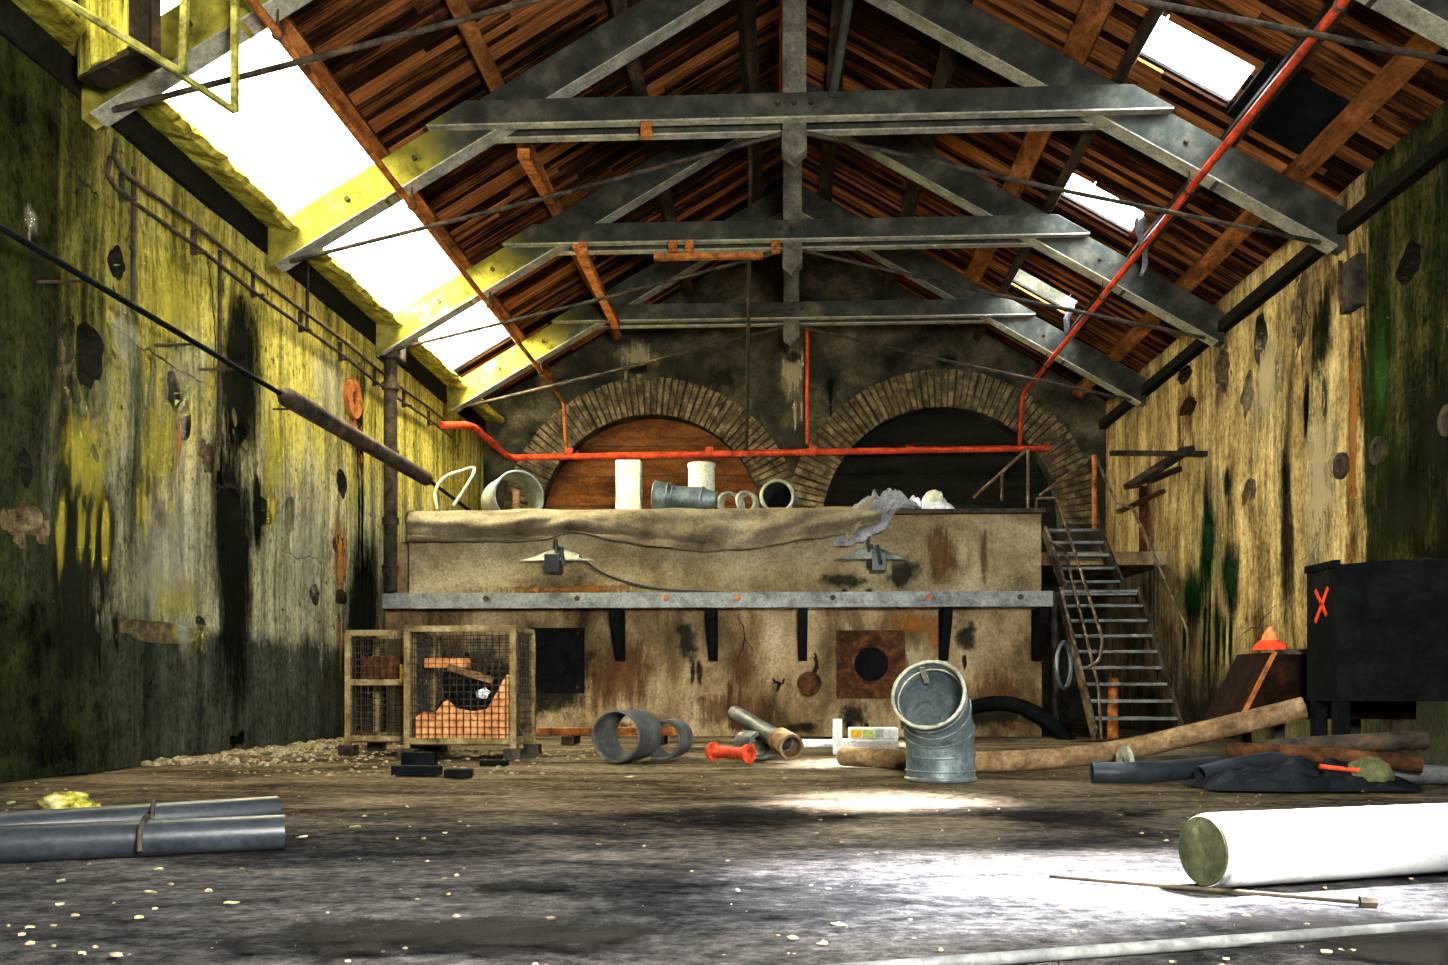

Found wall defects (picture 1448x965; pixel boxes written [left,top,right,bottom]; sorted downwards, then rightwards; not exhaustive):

water stain [44,453,119,763]
water stain [172,289,291,701]
water stain [230,730,244,747]
corrosion [928,527,955,583]